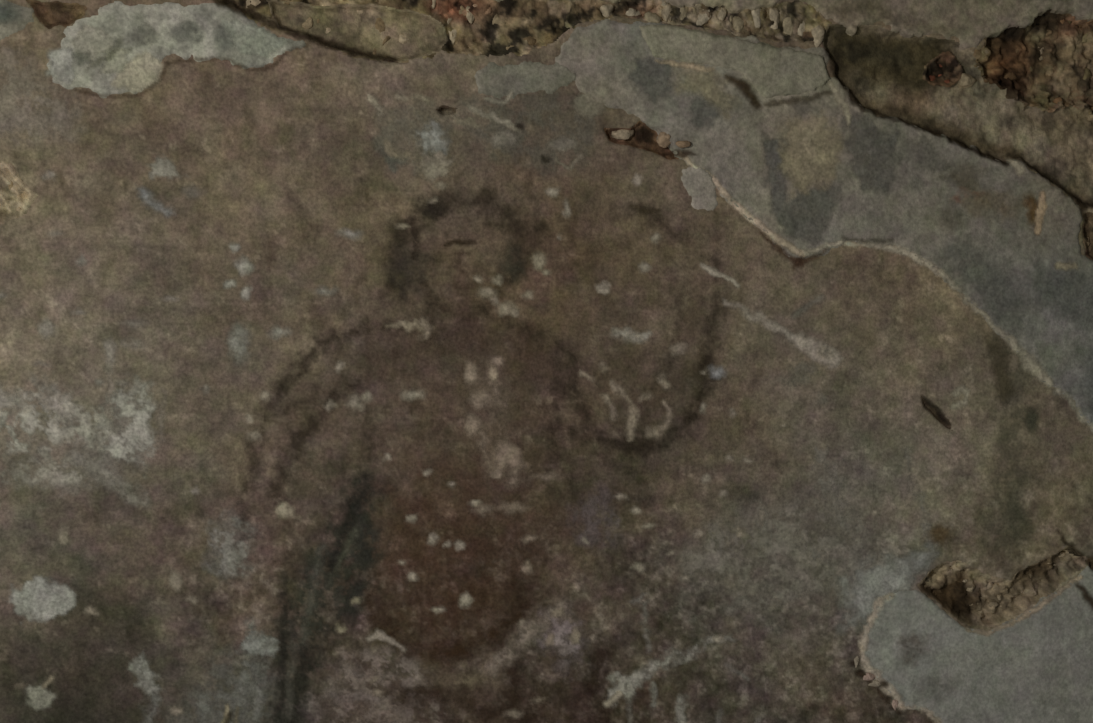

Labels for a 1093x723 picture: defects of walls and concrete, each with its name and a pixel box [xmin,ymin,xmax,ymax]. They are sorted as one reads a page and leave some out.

peeling [0,0,1093,441]
peeling [492,444,519,478]
peeling [429,534,464,550]
peeling [460,594,472,606]
spalling [858,594,941,723]